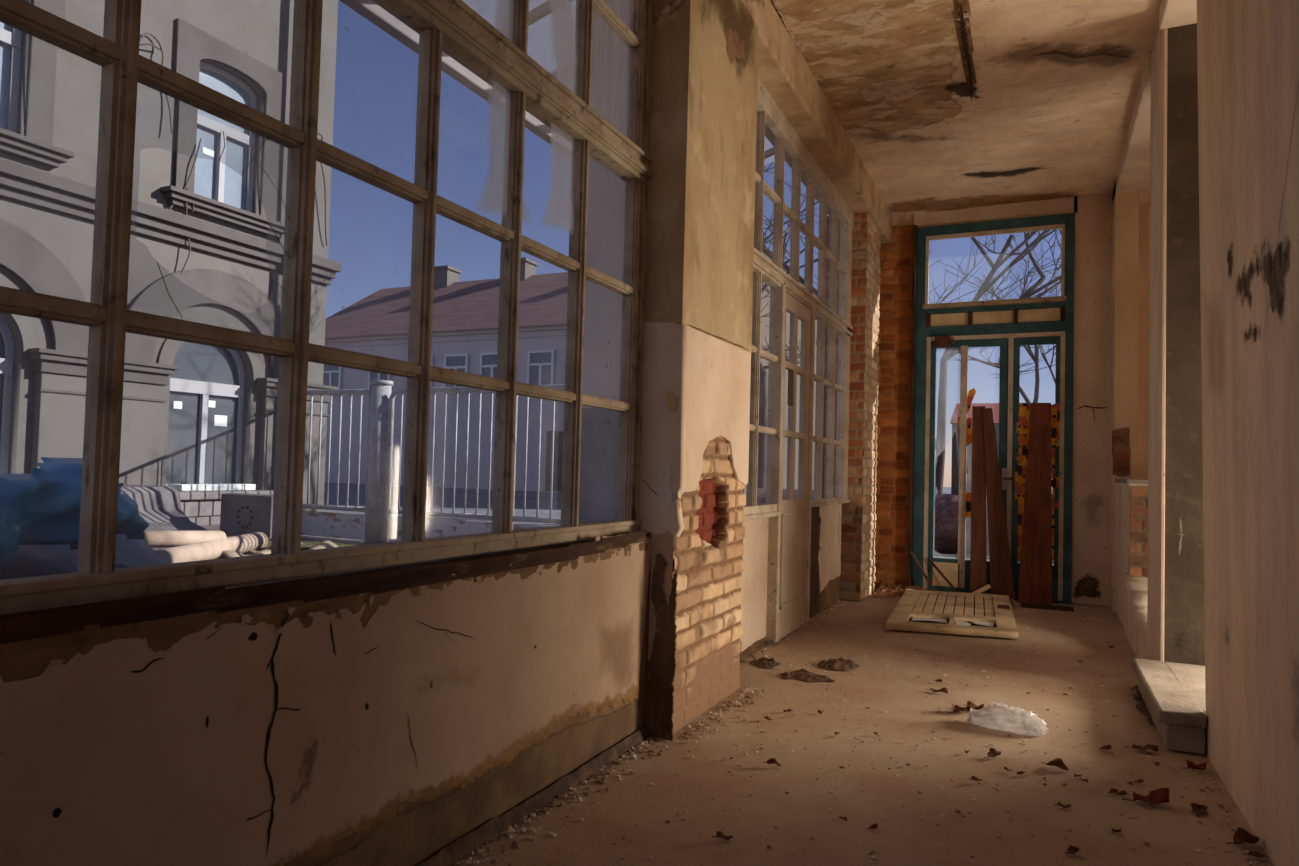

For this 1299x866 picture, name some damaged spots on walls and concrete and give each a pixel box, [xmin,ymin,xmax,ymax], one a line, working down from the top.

water stain [715,0,753,62]
peeling [726,25,746,64]
peeling [772,0,962,132]
water stain [1227,237,1290,317]
water stain [1244,324,1258,342]
peeling [0,436,746,734]
crack [330,624,379,656]
crack [245,605,300,858]